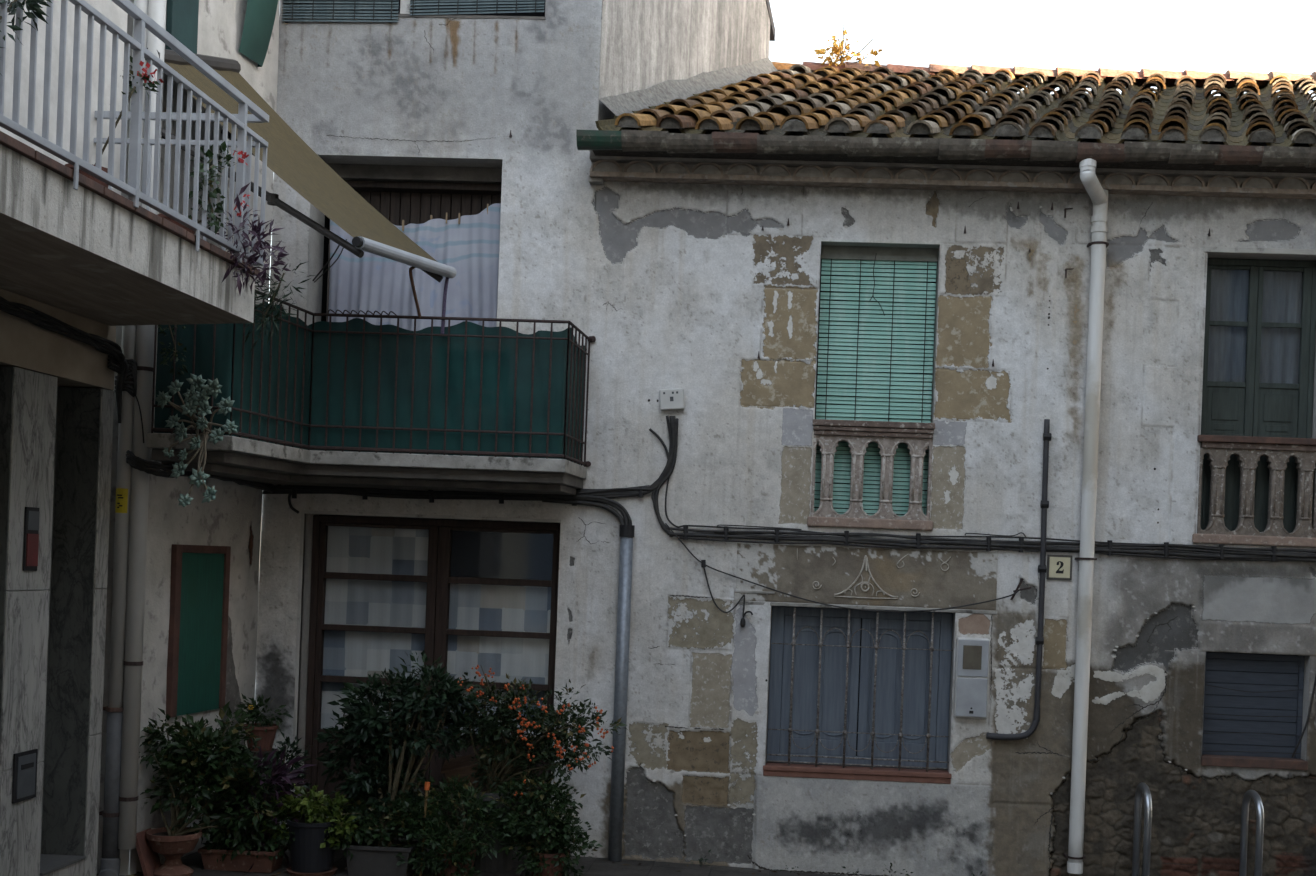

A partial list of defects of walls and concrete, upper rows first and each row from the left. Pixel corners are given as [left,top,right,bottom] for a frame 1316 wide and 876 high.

flaking render [592,187,818,410]
peeling [933,245,1012,423]
flaking render [1106,224,1177,271]
flaking render [1235,217,1301,242]
water stain [258,646,295,733]
flaking render [622,596,768,864]
peeling [950,576,1075,771]
flaking render [1092,603,1198,705]
water stain [781,806,945,849]